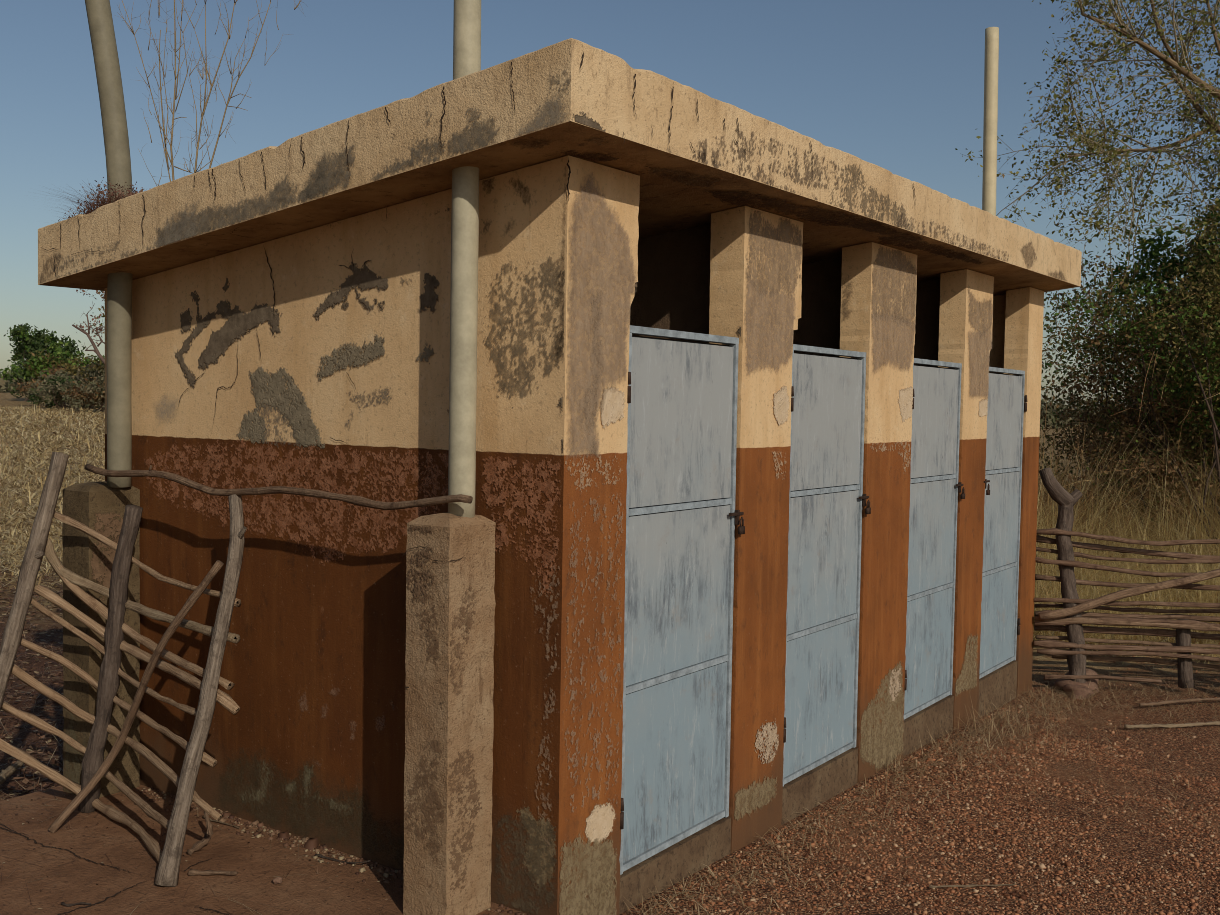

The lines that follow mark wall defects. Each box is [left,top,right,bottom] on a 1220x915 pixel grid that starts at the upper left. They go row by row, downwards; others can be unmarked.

crack [45,195,146,275]
crack [194,137,305,199]
damp [374,108,500,181]
crack [439,86,447,150]
damp [648,128,1037,267]
crack [177,225,275,430]
peeling [175,278,283,389]
peeling [315,332,385,380]
peeling [313,261,440,321]
damp [482,178,636,456]
peeling [146,367,477,694]
peeling [482,439,623,915]